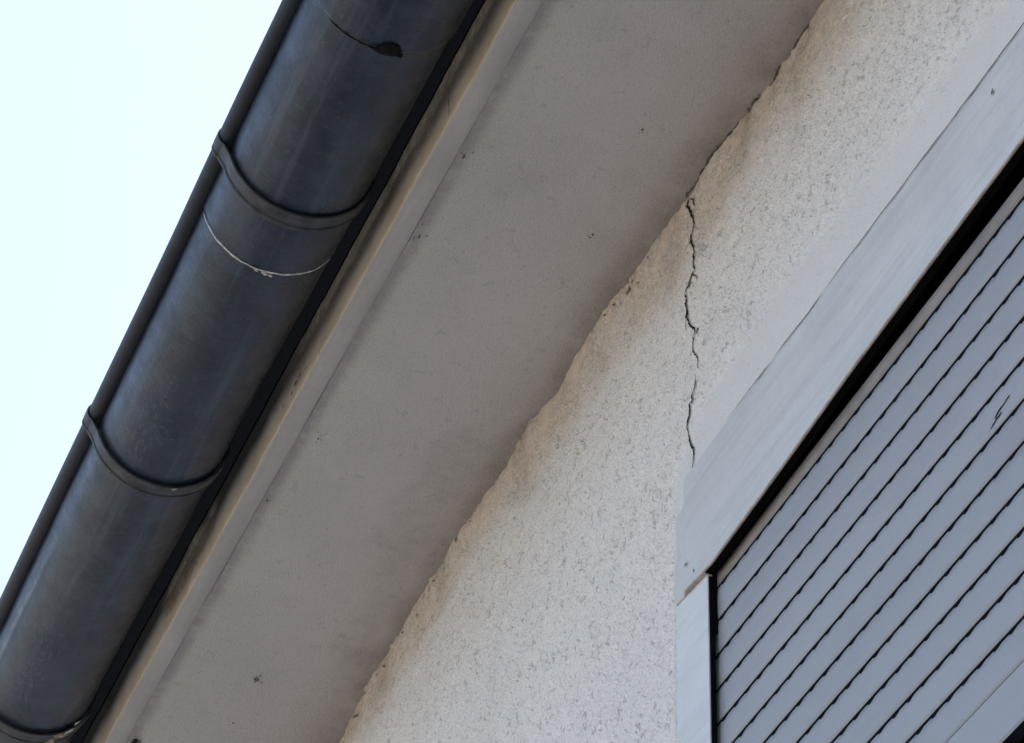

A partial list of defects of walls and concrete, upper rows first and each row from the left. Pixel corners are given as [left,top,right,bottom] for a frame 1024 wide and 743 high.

crack [684,23,810,467]